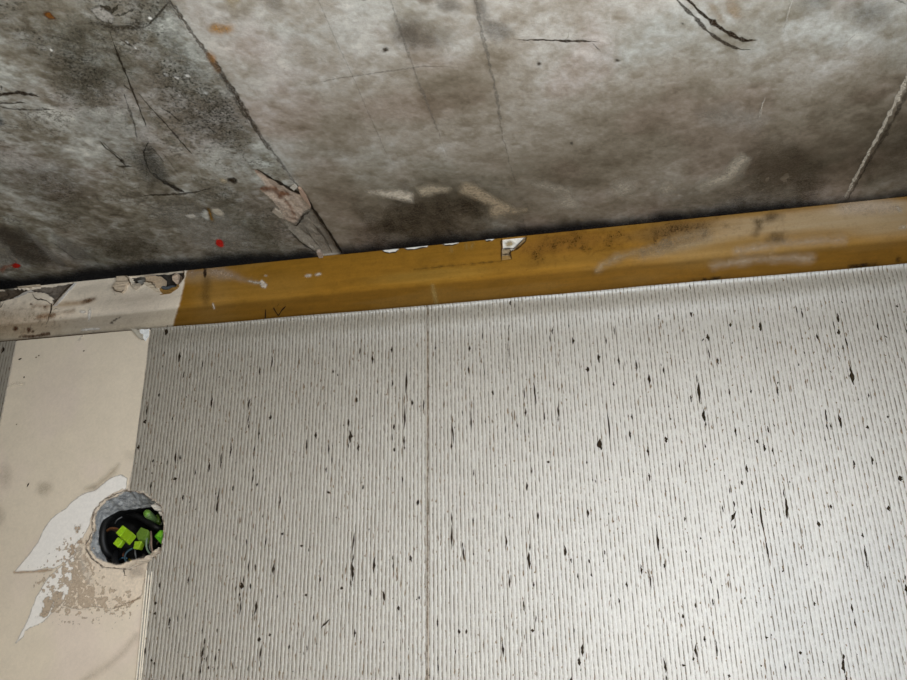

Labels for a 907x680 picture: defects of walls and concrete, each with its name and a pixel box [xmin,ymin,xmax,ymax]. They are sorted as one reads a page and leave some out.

leakage [87,0,168,53]
crack [677,0,755,50]
crack [0,86,54,110]
crack [100,0,297,196]
spalling [255,169,342,258]
leakage [373,186,446,201]
leakage [461,184,517,216]
leakage [340,193,907,255]
spalling [0,283,77,324]
spalling [113,270,185,295]
leakage [0,242,317,290]
spalling [14,475,148,642]